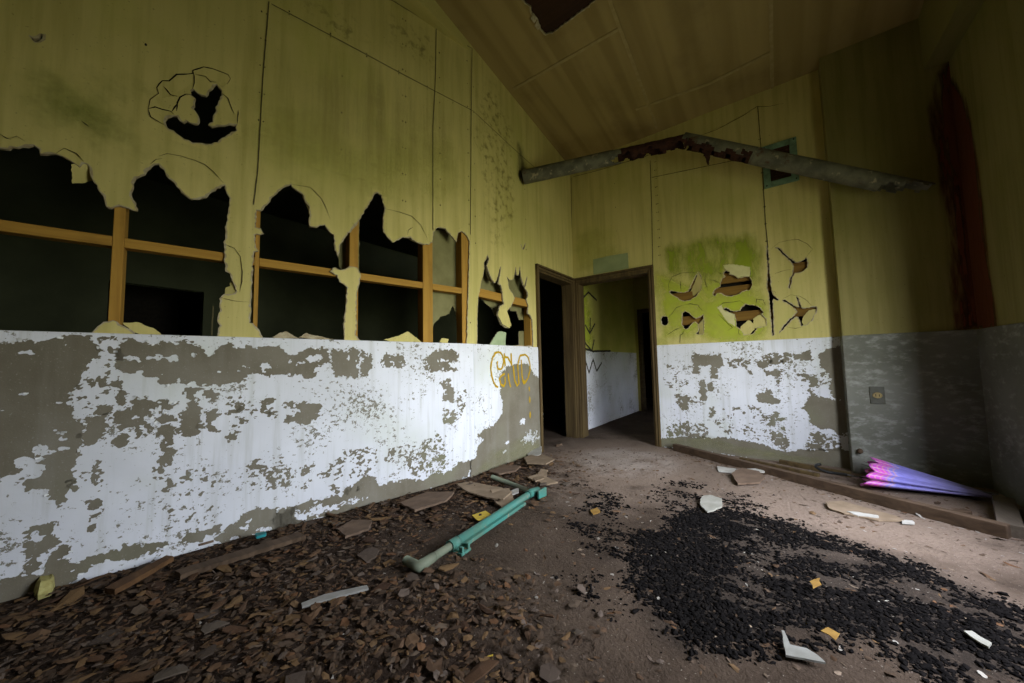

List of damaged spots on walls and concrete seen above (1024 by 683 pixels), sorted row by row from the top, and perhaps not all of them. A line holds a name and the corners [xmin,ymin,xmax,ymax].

peeling [0,134,541,603]
spalling [660,239,817,336]
peeling [661,346,850,469]
rust [951,80,997,329]